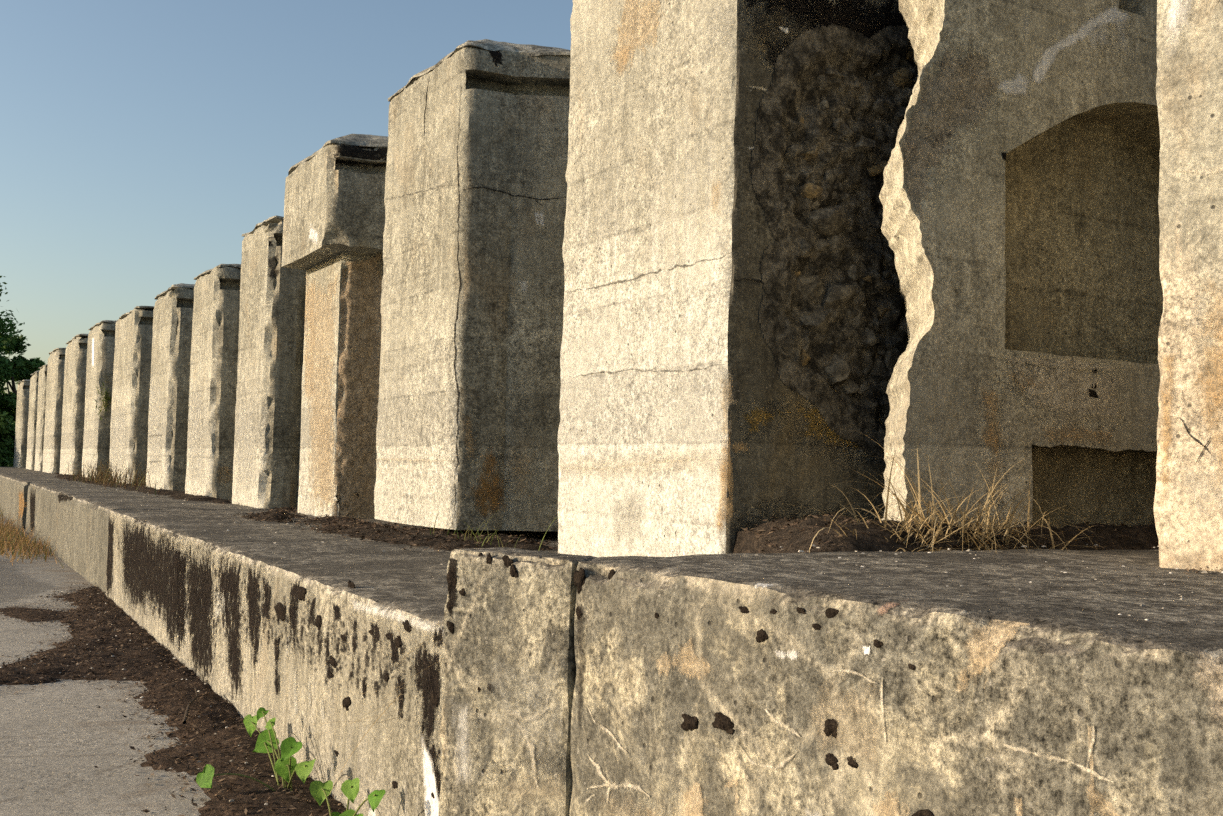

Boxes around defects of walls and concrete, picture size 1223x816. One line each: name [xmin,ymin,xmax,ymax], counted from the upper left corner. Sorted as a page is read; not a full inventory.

damp [999,7,1127,94]
damp [1168,0,1184,28]
spalling [745,0,998,468]
crack [376,92,562,521]
damp [173,537,188,656]
damp [273,580,300,702]
damp [333,603,357,657]
damp [371,622,403,719]
damp [429,626,444,646]